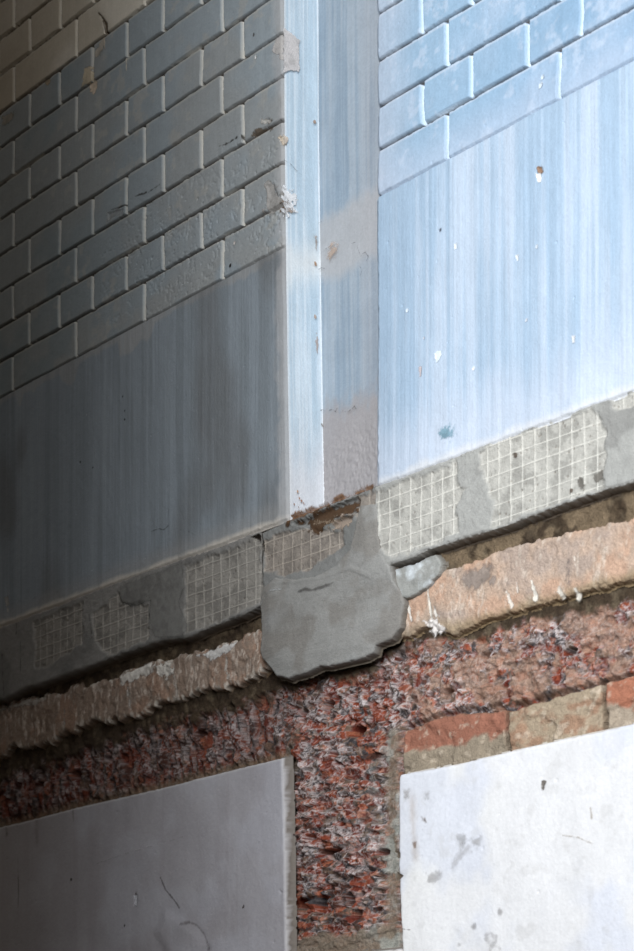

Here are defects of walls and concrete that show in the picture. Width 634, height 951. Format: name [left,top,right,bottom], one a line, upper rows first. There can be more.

spalling [441,491,634,569]
spalling [0,586,634,951]